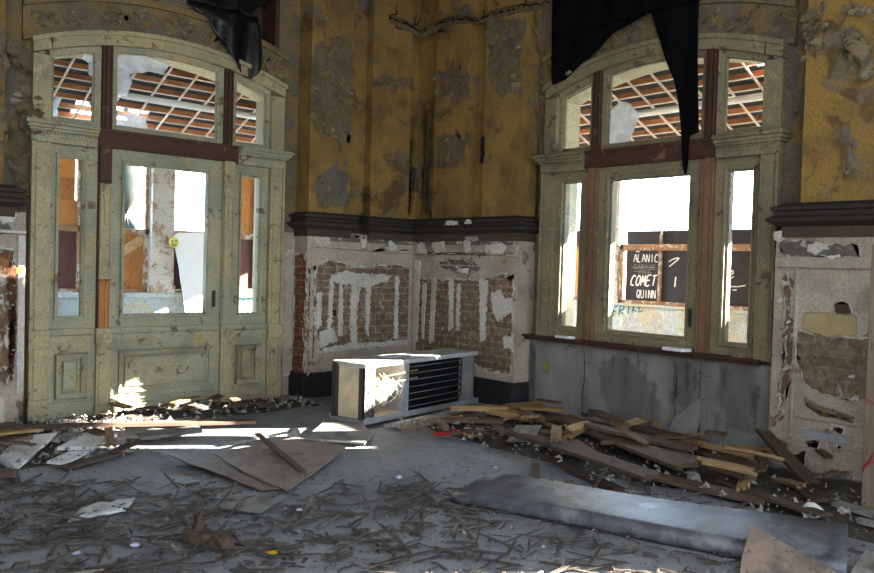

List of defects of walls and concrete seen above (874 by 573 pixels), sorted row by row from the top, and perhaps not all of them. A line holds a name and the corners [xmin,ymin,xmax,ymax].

crack [389,0,550,38]
peeling [766,0,874,82]
spalling [0,214,17,387]
flaking render [281,235,519,376]
spalling [773,231,862,260]
flaking render [773,270,868,429]